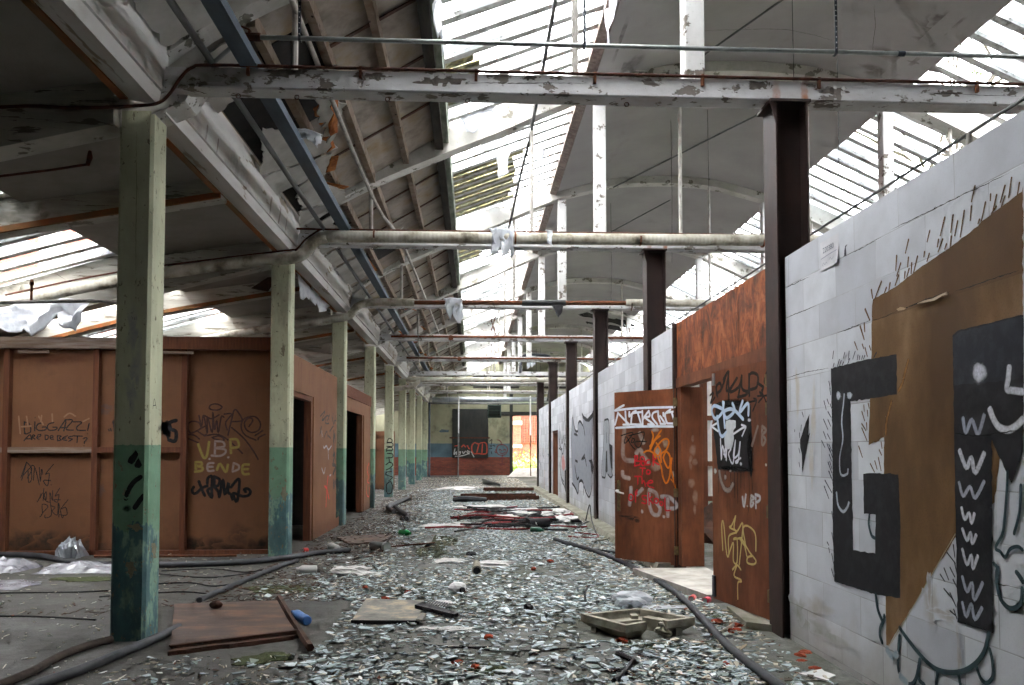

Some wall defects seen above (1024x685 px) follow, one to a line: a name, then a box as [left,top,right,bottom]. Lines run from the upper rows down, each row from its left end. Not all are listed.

peeling [263,69,310,79]
peeling [353,71,397,97]
peeling [413,74,468,98]
peeling [743,81,773,91]
peeling [808,84,850,109]
peeling [934,88,962,98]